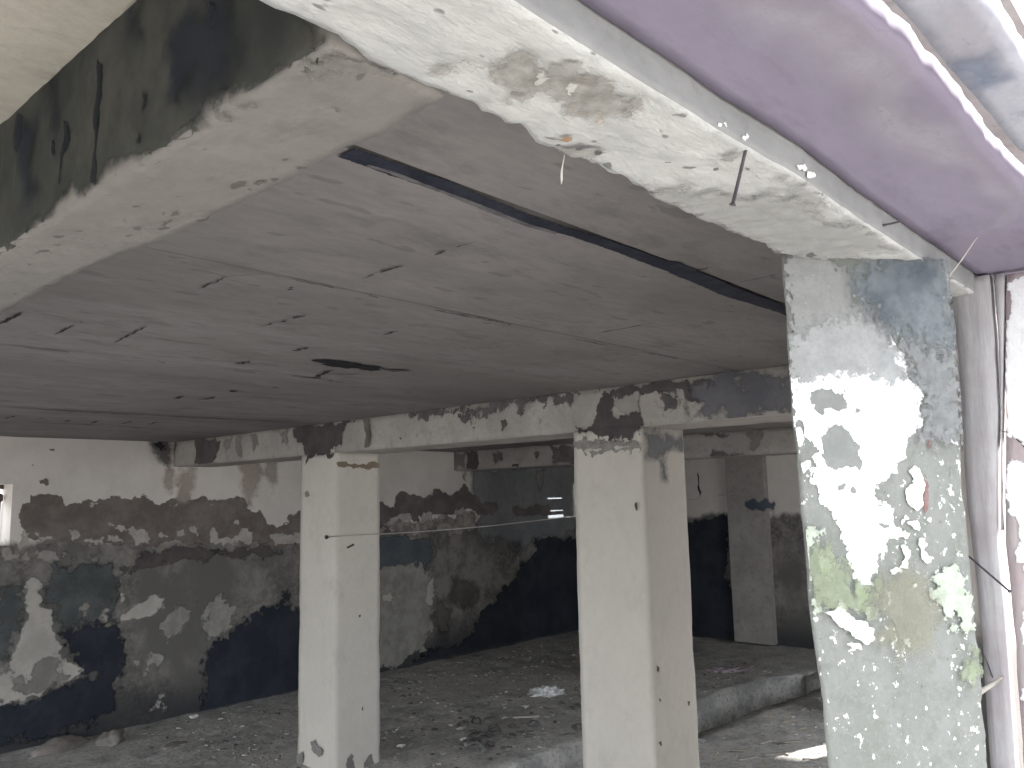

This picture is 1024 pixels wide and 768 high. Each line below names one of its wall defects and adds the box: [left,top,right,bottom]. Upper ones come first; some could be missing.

leakage [0,0,326,253]
peeling [292,420,380,470]
peeling [573,379,715,458]
peeling [784,255,976,635]
peeling [0,478,300,565]
peeling [379,484,498,538]
peeling [512,504,551,517]
peeling [0,577,84,706]
peeling [133,652,164,676]
peeling [120,593,236,641]
peeling [379,561,436,670]
peeling [811,597,875,650]